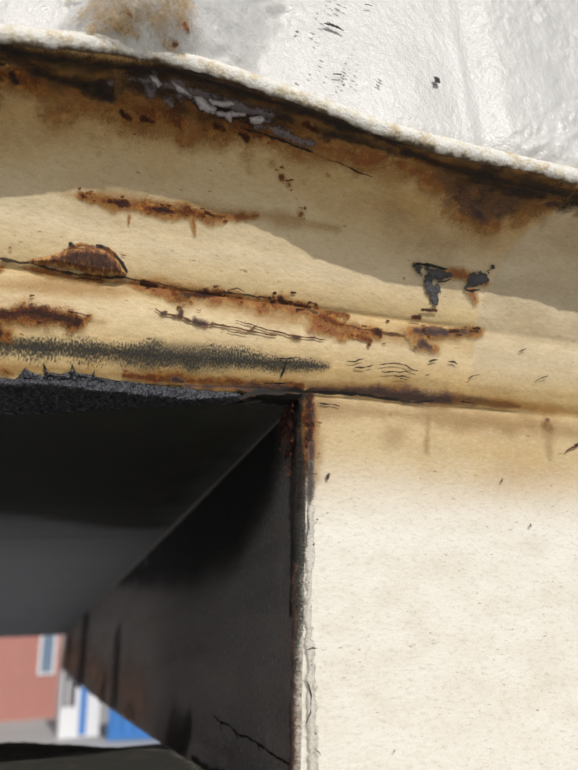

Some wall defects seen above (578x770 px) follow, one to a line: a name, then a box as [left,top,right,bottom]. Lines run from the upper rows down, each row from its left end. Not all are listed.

rust [71,0,195,52]
peeling [172,82,266,124]
rust [0,44,578,236]
spalling [412,262,495,305]
rust [0,294,92,348]
rust [121,370,322,665]
crack [213,715,289,765]